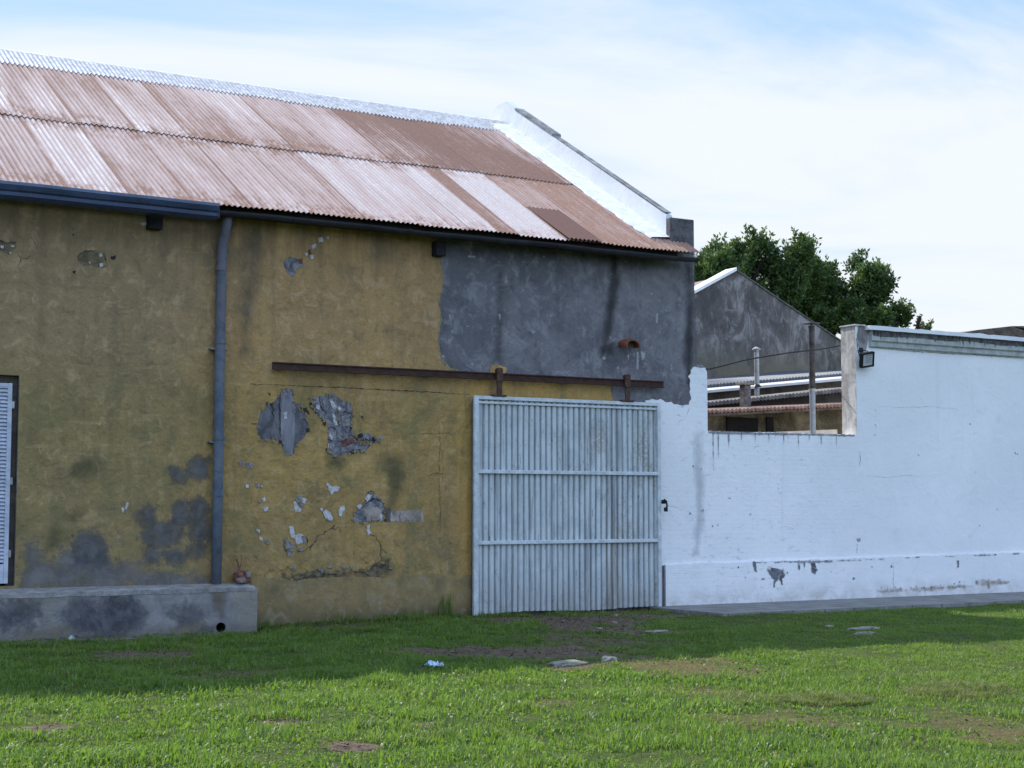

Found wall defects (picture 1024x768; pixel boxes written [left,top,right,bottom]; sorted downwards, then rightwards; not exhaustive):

flaking render [72,250,116,274]
flaking render [283,236,329,277]
flaking render [251,388,384,458]
peeling [293,496,306,512]
flaking render [320,491,386,535]
leakage [23,497,213,634]
flaking render [269,526,393,581]